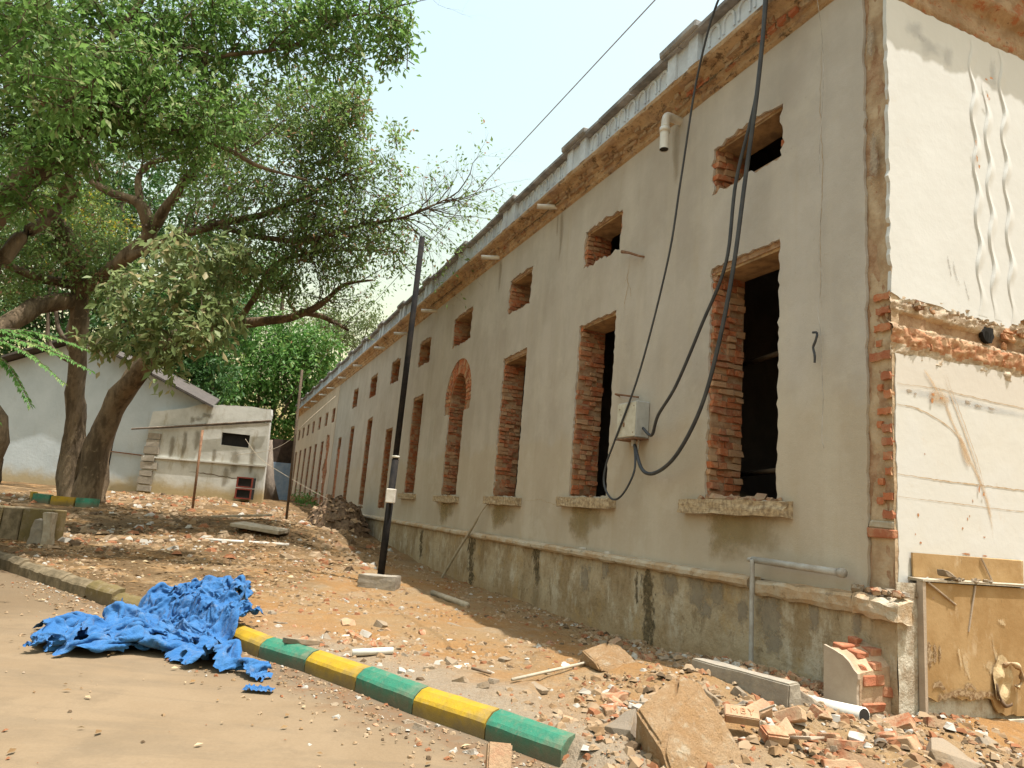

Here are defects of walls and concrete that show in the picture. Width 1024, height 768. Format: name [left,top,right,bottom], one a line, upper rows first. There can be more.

flaking render [865,0,1024,591]
crack [899,383,1024,444]
crack [897,473,1024,512]
water stain [634,569,722,646]